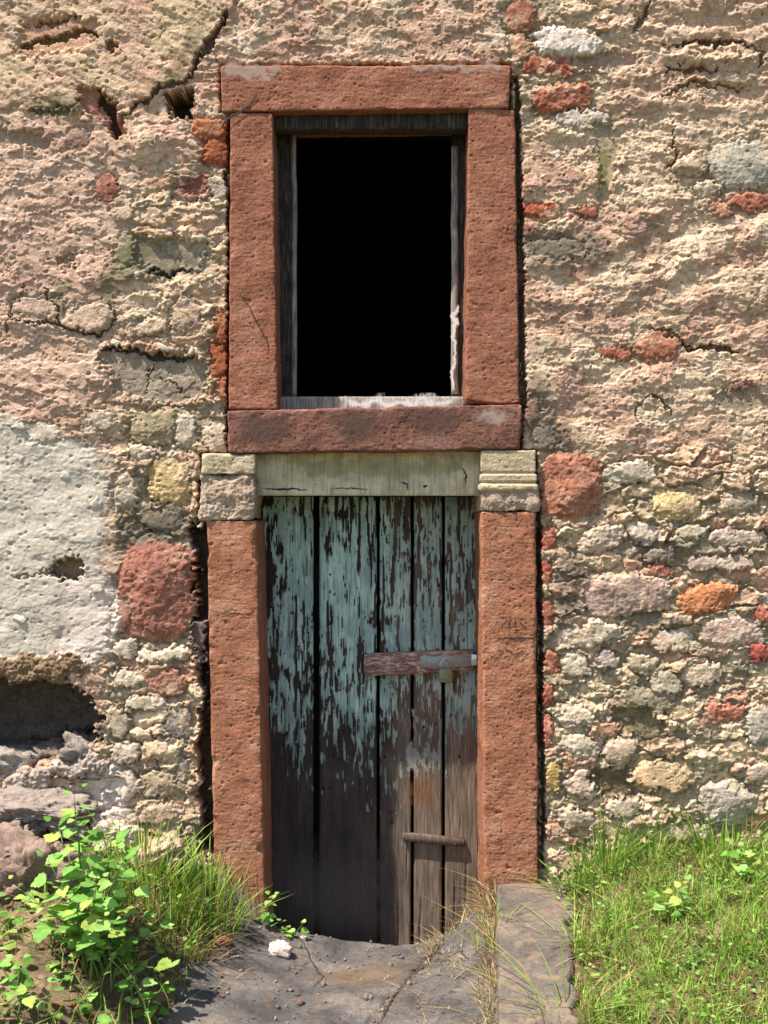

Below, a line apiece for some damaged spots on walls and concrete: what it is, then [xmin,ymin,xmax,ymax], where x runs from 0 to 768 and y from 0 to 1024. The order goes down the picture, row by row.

crack [121,8,229,117]
crack [661,37,768,98]
crack [5,284,117,338]
crack [646,324,739,354]
spalling [0,651,124,790]